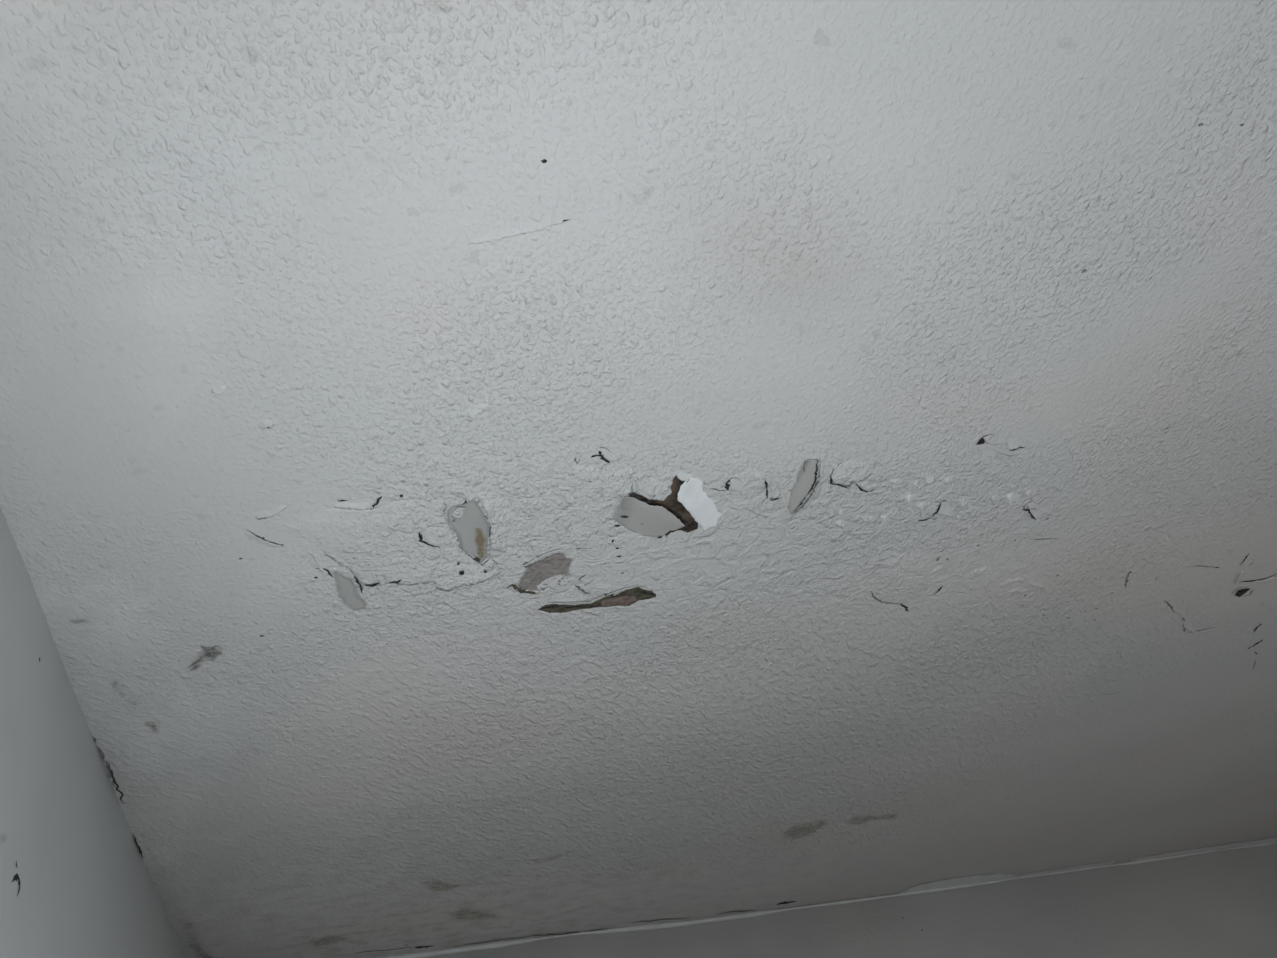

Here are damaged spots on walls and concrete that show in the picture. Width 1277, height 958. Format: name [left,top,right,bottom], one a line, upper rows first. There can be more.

peeling [976,434,1024,461]
peeling [284,492,517,610]
flaking render [507,548,656,613]
peeling [611,454,831,557]
crack [1094,572,1262,669]
crack [1188,554,1277,597]